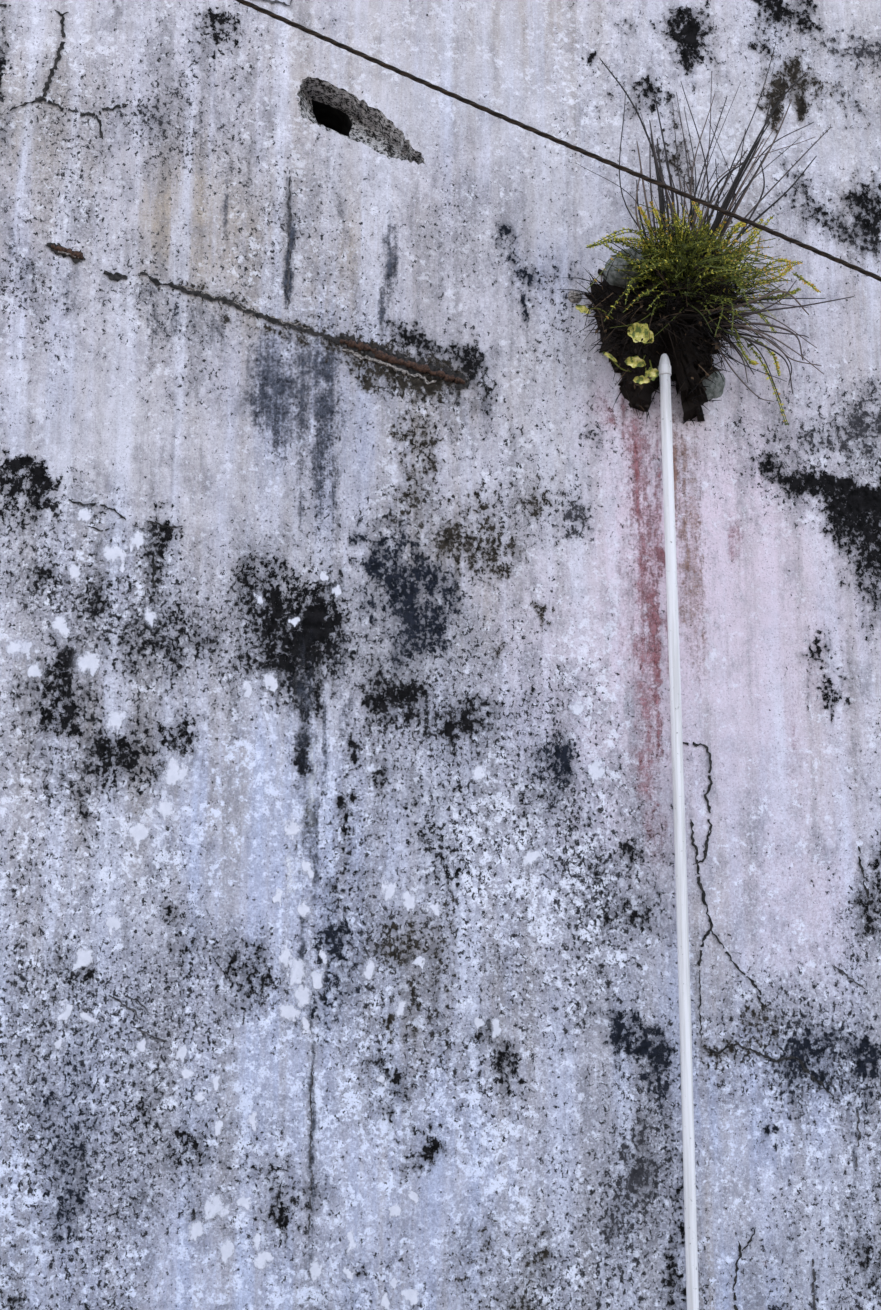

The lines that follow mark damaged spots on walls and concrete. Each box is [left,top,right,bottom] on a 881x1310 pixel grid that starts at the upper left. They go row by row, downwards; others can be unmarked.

crack [9,10,129,139]
leakage [746,0,881,133]
leakage [777,151,881,270]
corrosion [340,339,465,384]
leakage [751,375,881,645]
corrosion [607,401,704,797]
leakage [0,179,675,1248]
crack [858,846,870,905]
crack [683,742,865,1171]
leakage [701,975,881,1171]
crack [732,1228,756,1310]
crack [810,1259,818,1310]